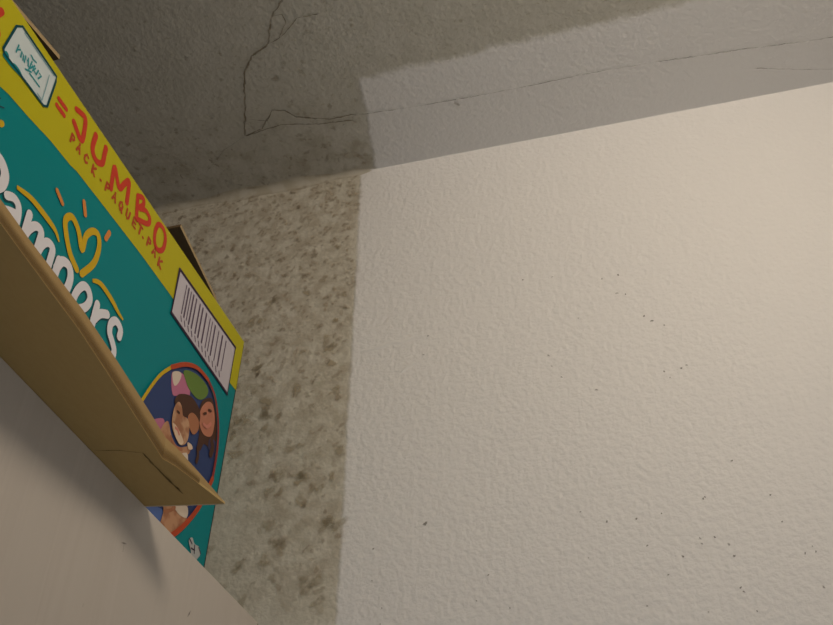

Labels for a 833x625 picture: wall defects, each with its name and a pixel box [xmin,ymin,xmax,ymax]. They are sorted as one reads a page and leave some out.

crack [243,0,391,136]